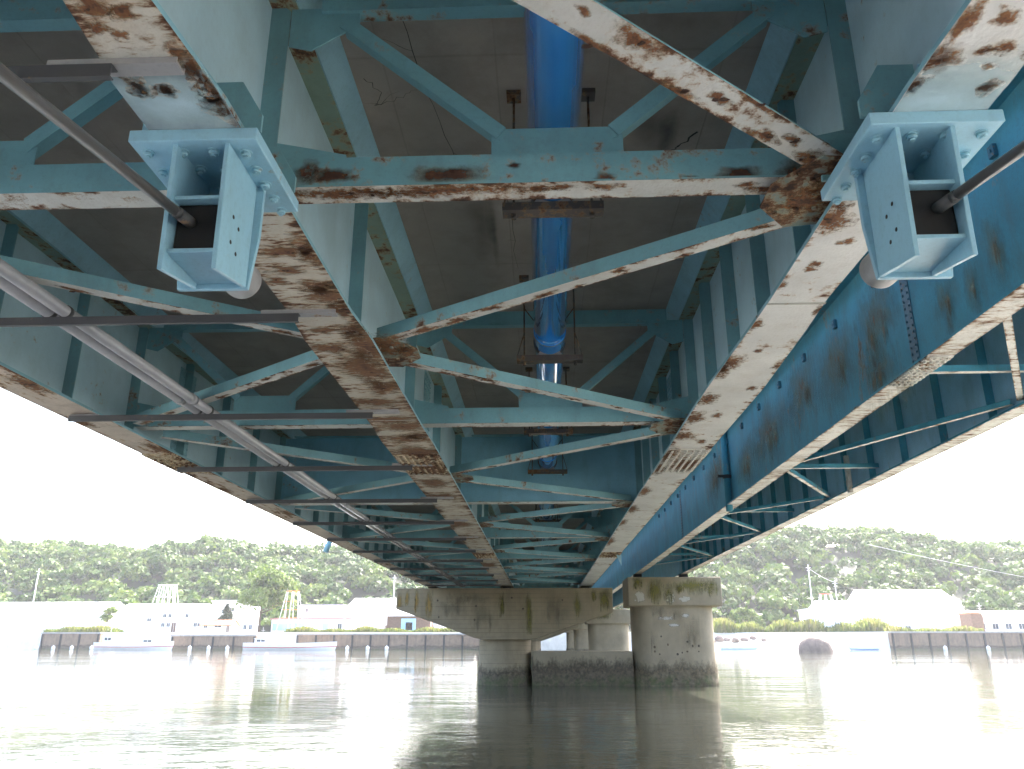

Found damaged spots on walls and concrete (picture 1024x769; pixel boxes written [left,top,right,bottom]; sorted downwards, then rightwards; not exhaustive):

corrosion [74,0,136,39]
corrosion [615,25,662,53]
corrosion [907,0,1019,95]
corrosion [165,41,232,117]
corrosion [707,92,773,114]
corrosion [750,128,822,175]
corrosion [294,163,626,201]
corrosion [751,182,860,245]
corrosion [258,233,470,500]
corrosion [715,349,762,379]
corrosion [655,394,722,474]
damp [397,592,432,615]